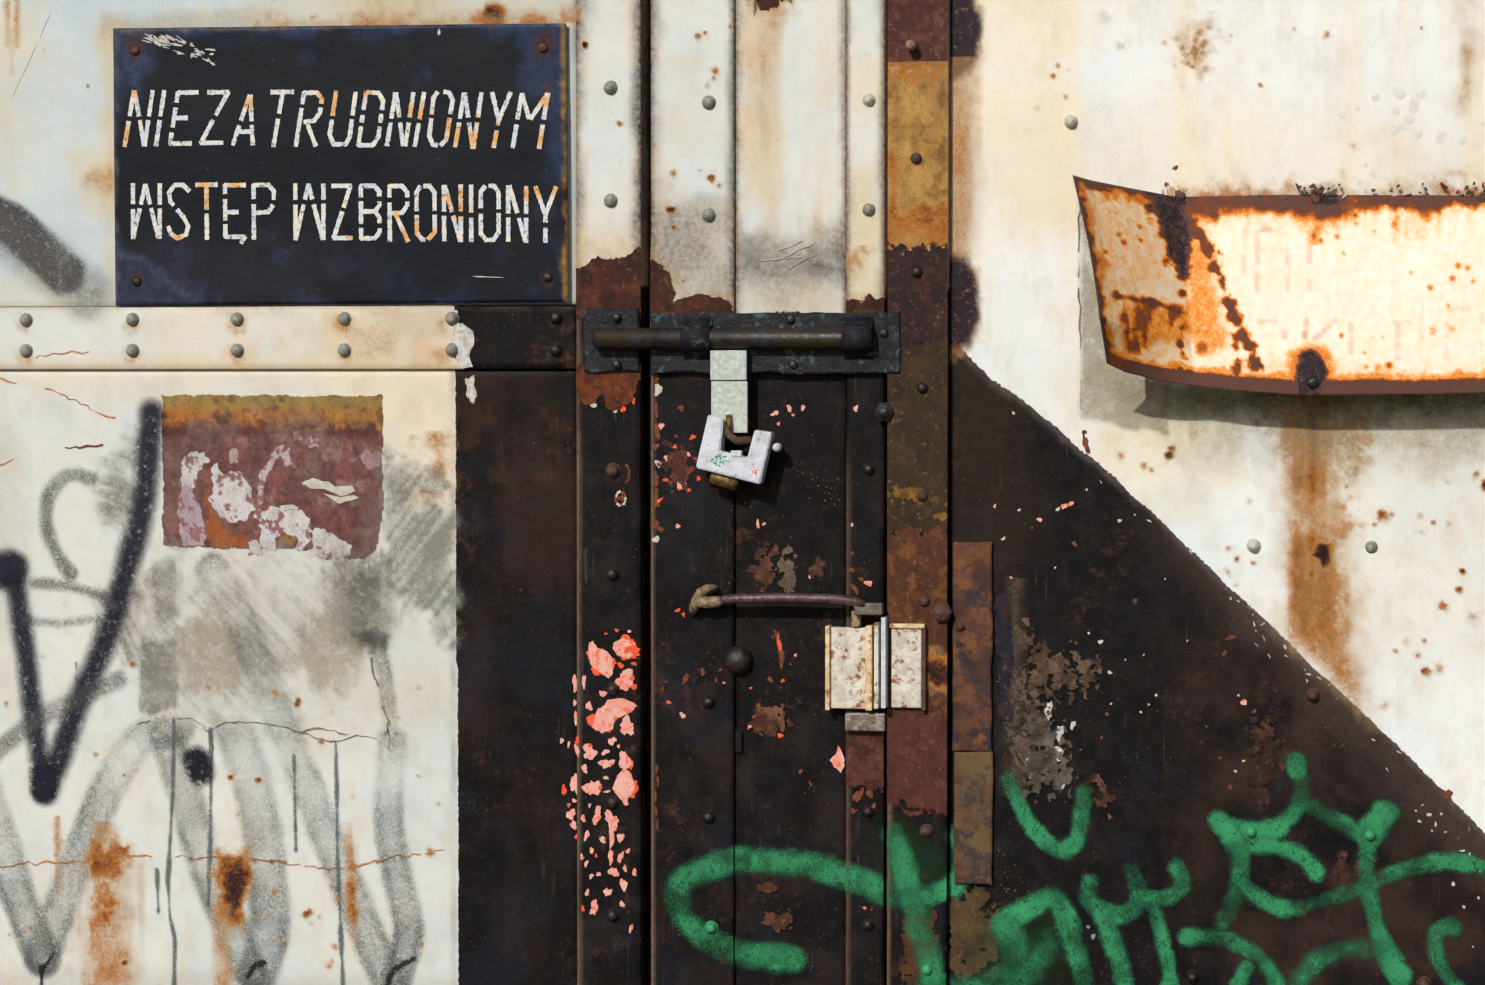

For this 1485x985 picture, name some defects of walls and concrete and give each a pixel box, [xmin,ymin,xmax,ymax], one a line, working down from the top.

peeling [744,0,783,11]
rust [1166,181,1485,199]
rust [576,247,733,328]
peeling [161,394,384,560]
rust [748,0,982,818]
rust [1279,394,1373,697]
peeling [560,629,641,915]
spalling [996,617,1112,812]
rust [0,815,151,985]
rust [175,844,445,985]